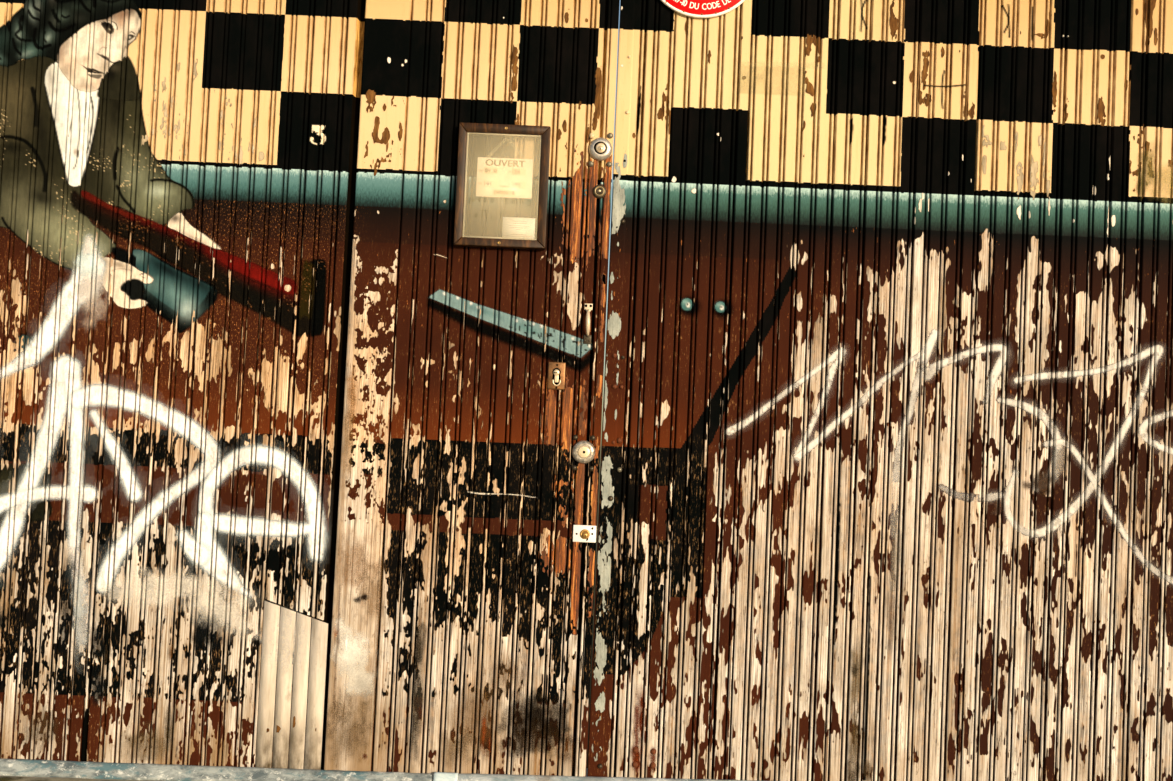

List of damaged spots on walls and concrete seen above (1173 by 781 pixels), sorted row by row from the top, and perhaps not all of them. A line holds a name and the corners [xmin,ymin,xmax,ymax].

peeling [141,59,198,160]
peeling [214,90,267,164]
peeling [364,89,405,176]
peeling [650,83,671,134]
peeling [802,34,820,131]
peeling [909,47,945,106]
peeling [963,92,1051,219]
peeling [1052,72,1069,122]
peeling [1097,97,1106,126]
peeling [1129,124,1154,192]
peeling [0,193,1173,781]